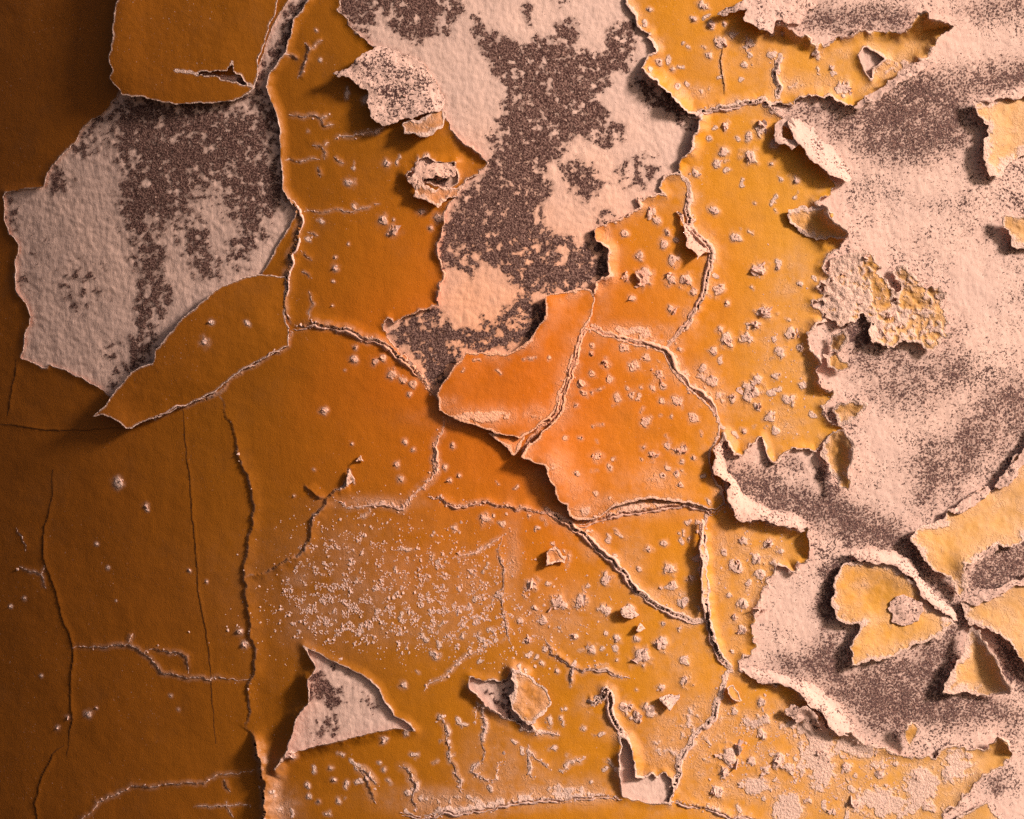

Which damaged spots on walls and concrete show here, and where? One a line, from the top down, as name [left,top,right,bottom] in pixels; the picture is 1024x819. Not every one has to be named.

peeling [4,0,308,429]
peeling [285,649,413,758]
crack [0,176,753,819]
peeling [338,0,1024,819]